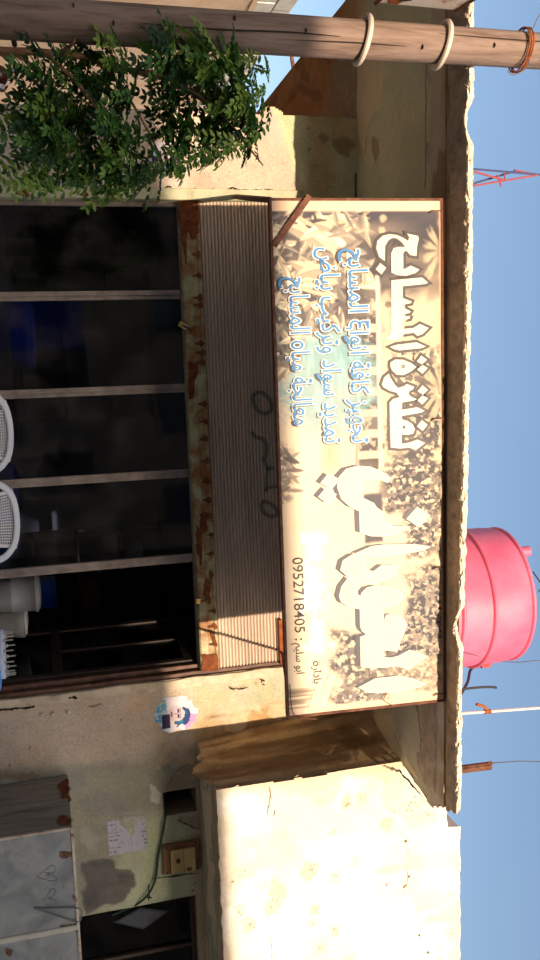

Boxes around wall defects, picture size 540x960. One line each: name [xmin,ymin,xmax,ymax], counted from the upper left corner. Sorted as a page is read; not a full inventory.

corrosion [188,340,207,407]
corrosion [196,497,219,672]
water stain [191,714,375,787]
spalling [374,702,444,835]
crack [399,769,422,797]
spalling [299,859,325,882]